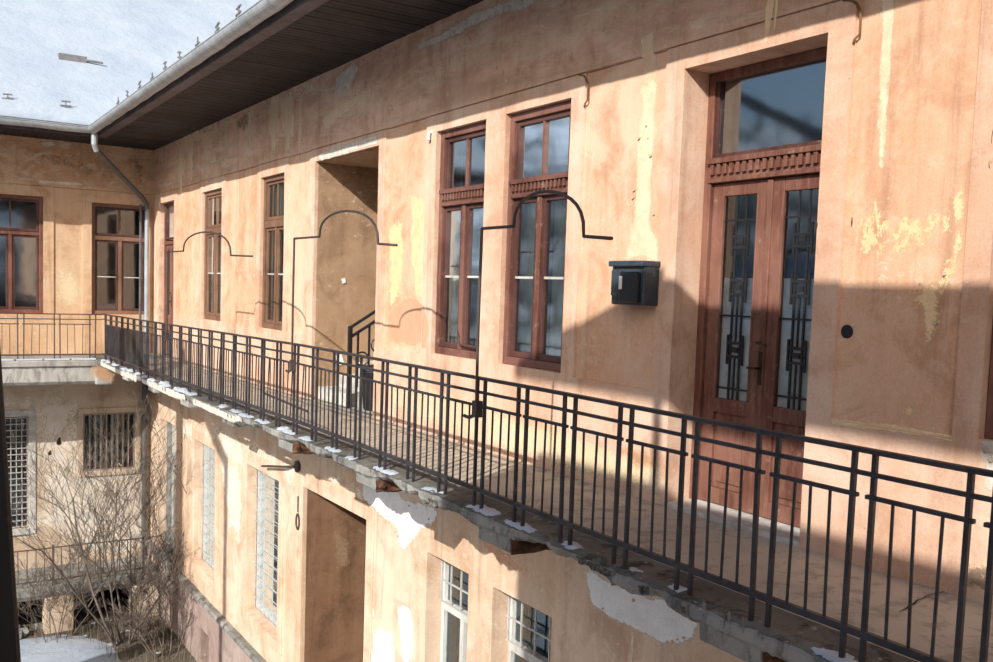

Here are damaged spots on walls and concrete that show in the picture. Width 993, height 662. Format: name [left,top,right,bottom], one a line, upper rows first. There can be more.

peeling [627,79,658,261]
peeling [908,186,965,343]
peeling [982,441,993,491]
peeling [363,479,437,549]
peeling [371,601,413,662]
peeling [576,556,698,644]